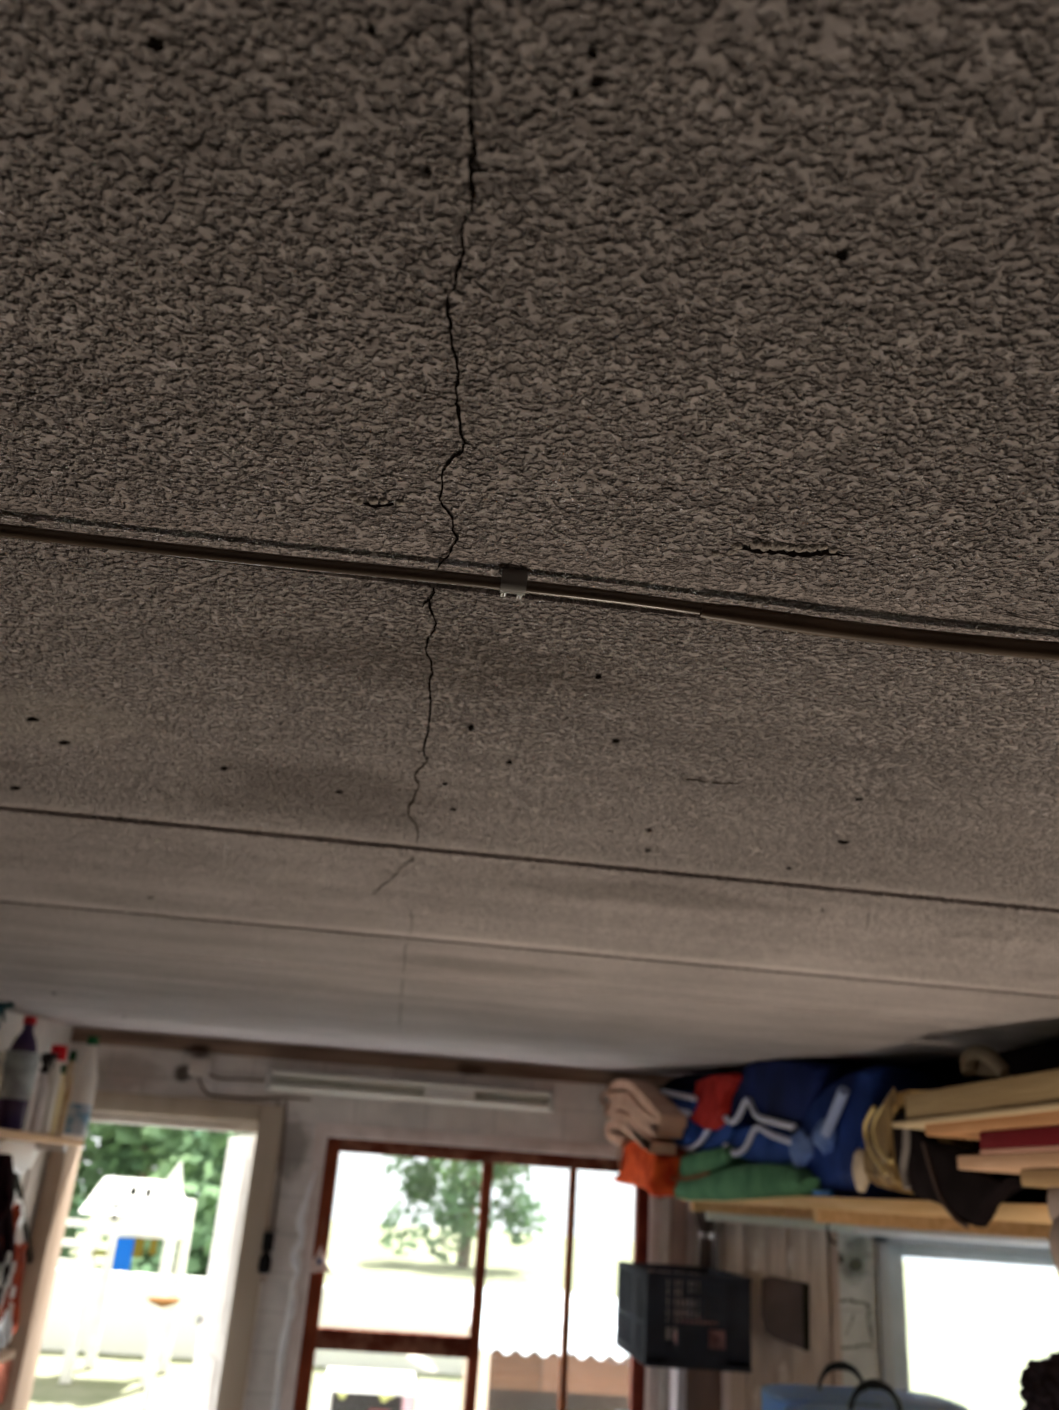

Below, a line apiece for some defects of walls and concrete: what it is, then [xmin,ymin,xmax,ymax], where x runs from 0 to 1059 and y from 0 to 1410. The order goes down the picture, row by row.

crack [373,0,482,894]